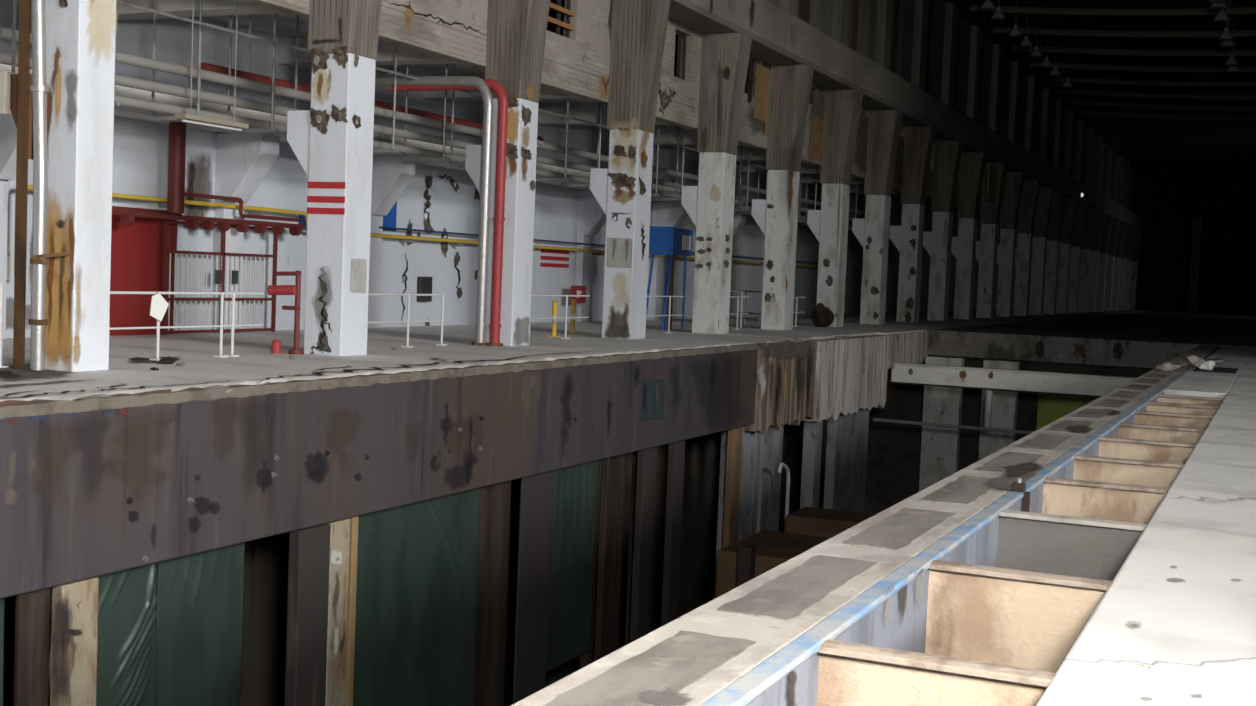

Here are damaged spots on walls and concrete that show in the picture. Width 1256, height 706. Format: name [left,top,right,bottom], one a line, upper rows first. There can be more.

crack [382,0,484,35]
corrosion [317,71,331,95]
spalling [310,104,361,134]
corrosion [506,85,536,191]
corrosion [45,203,80,362]
leakage [431,405,477,488]
leakage [306,453,327,482]
leakage [190,498,219,532]